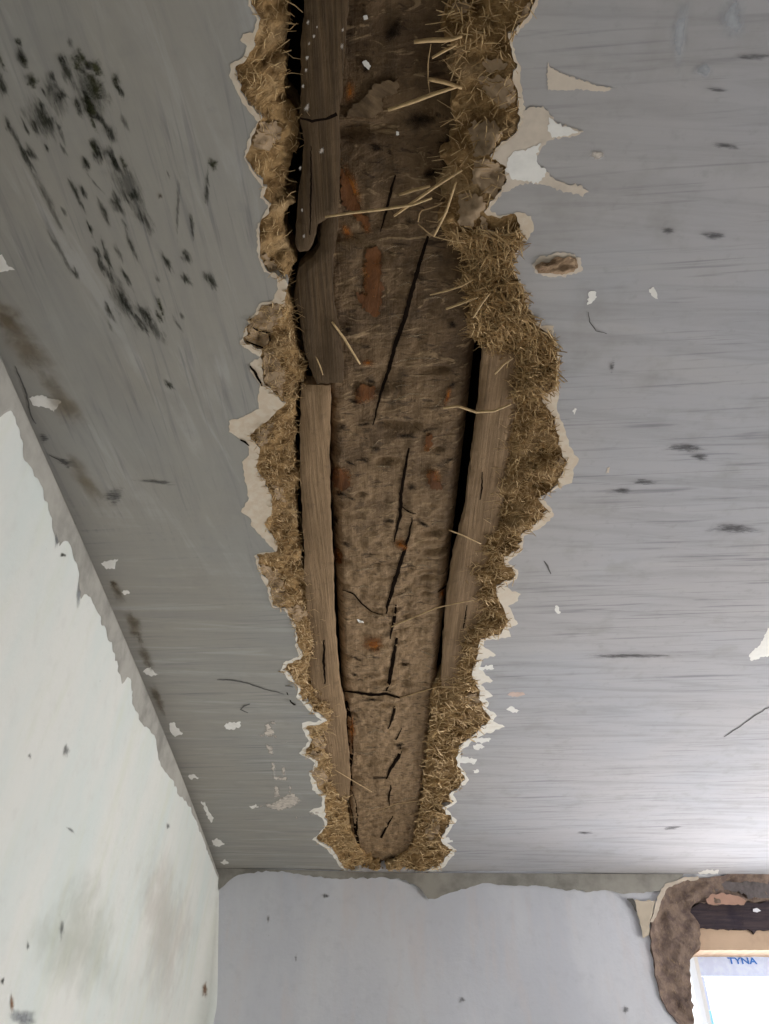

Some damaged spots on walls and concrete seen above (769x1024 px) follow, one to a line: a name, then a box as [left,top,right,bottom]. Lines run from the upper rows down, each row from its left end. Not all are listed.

leakage [6,40,127,170]
leakage [103,189,138,223]
leakage [87,222,164,324]
peeling [229,0,288,614]
crack [372,236,429,425]
peeling [484,0,588,376]
peeling [546,63,611,92]
crack [322,448,416,848]
peeling [0,357,769,1024]